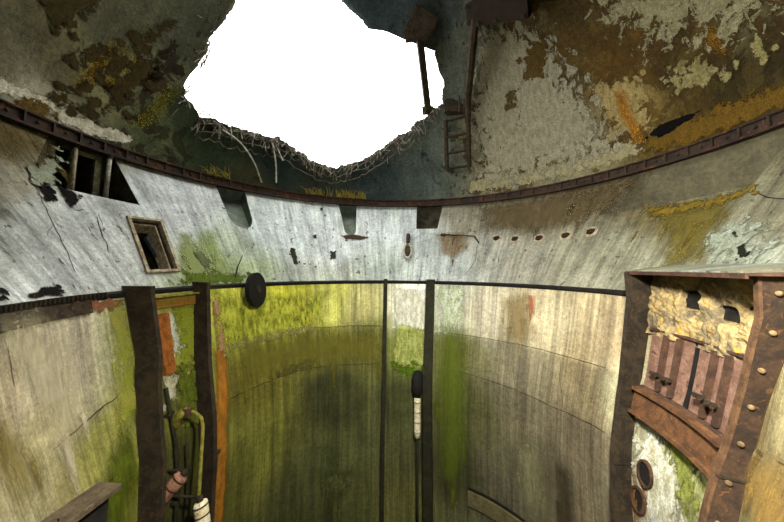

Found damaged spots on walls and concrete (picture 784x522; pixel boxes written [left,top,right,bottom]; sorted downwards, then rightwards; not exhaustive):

spalling [0,0,449,184]
peeling [461,0,784,194]
corrosion [615,82,784,155]
peeling [26,144,83,208]
corrosion [441,234,467,266]
spalling [28,284,67,298]
spalling [645,275,754,361]